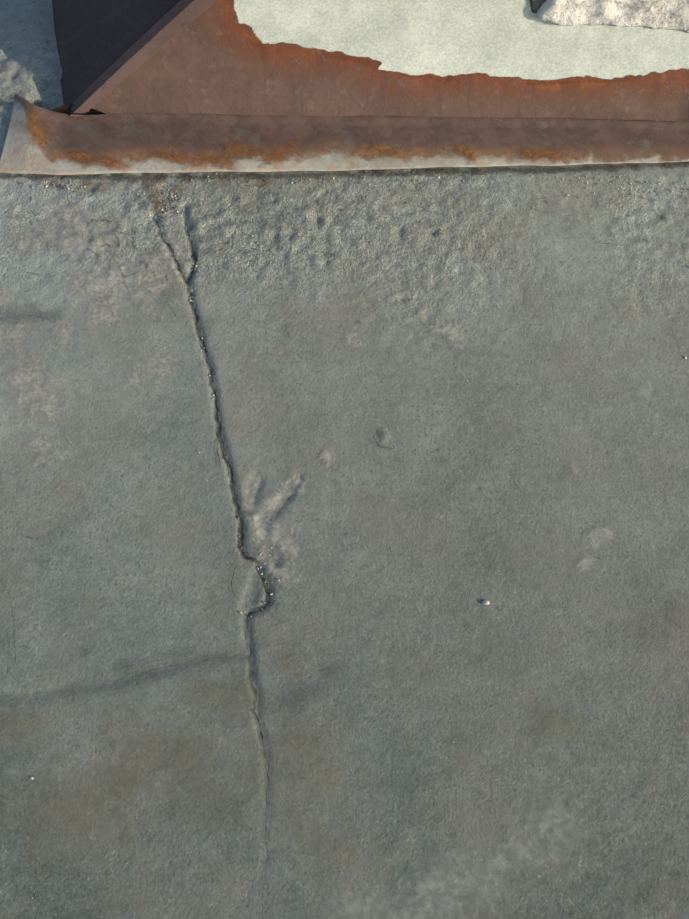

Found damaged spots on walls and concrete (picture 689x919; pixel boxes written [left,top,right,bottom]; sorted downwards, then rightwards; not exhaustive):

rust [14,0,689,170]
flaking render [530,0,546,14]
crack [139,202,280,866]